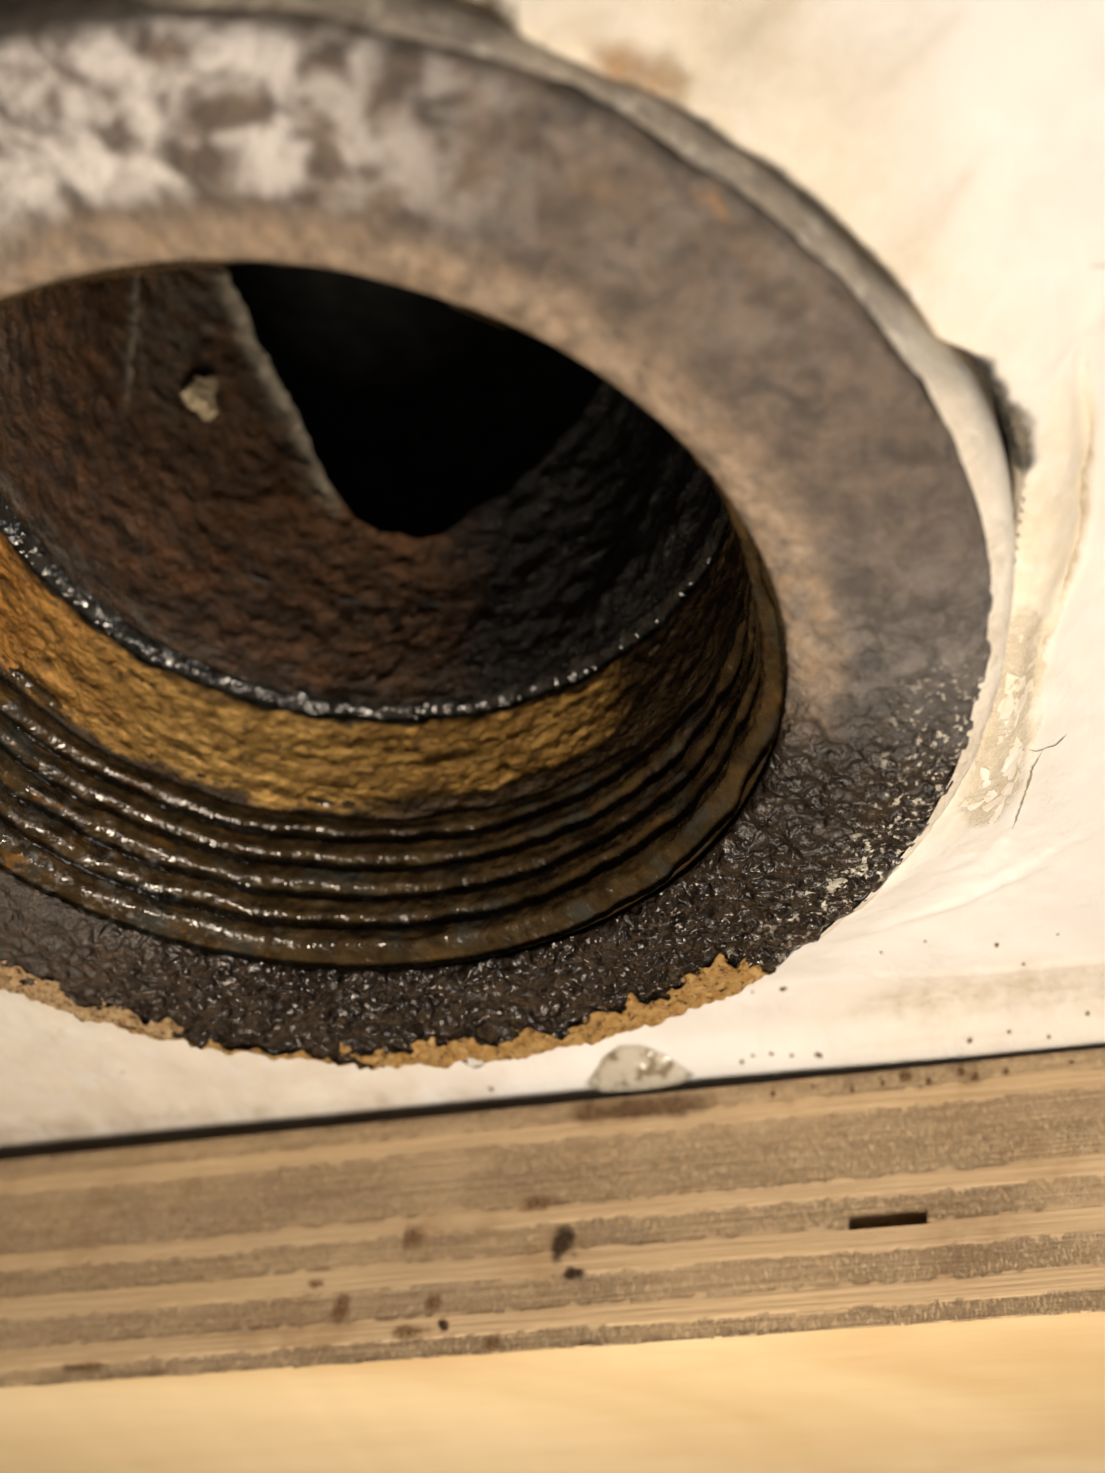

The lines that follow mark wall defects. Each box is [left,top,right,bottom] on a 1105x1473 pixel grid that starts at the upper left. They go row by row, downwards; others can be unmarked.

rust [0,953,778,1070]